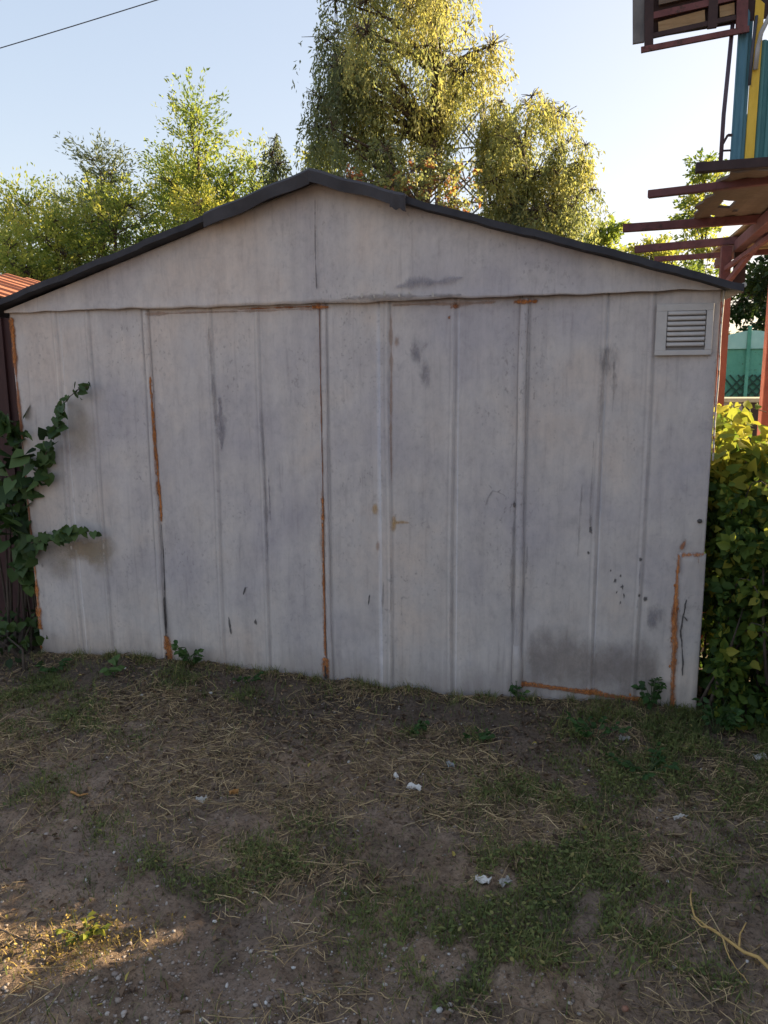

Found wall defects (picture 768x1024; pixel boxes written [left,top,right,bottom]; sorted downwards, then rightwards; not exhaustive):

rust [9,317,23,448]
rust [149,377,162,521]
rust [164,636,173,660]
rust [321,461,329,680]
rust [521,681,640,701]
rust [669,541,704,707]